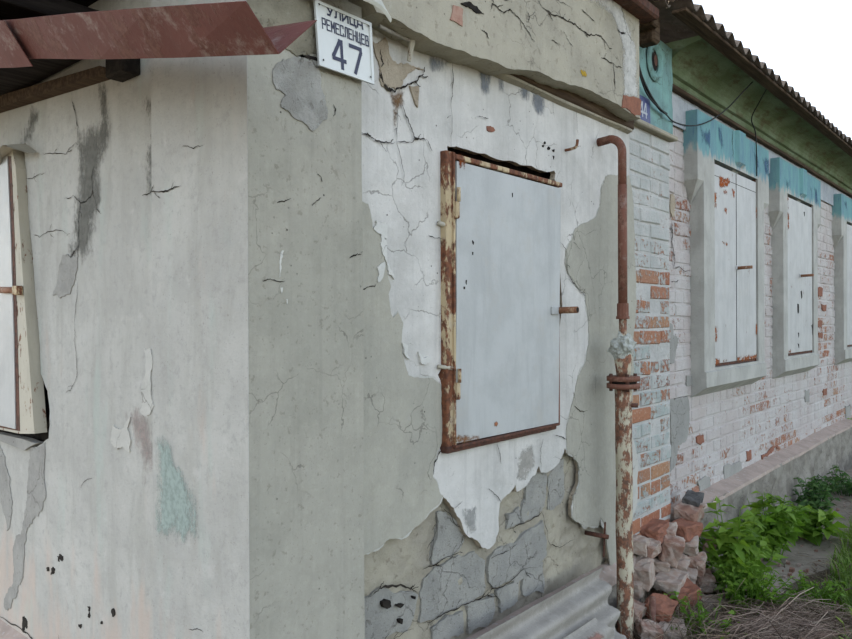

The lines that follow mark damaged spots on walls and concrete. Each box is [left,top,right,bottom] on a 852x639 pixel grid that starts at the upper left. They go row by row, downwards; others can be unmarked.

flaking render [247,0,328,131]
flaking render [373,37,424,108]
crack [363,50,454,184]
crack [491,0,630,91]
flaking render [621,95,641,116]
damp [75,92,108,254]
crack [142,184,179,198]
rust [715,177,735,214]
crack [36,167,101,391]
peeling [373,220,395,282]
flaking render [0,442,47,611]
spalling [380,599,404,609]